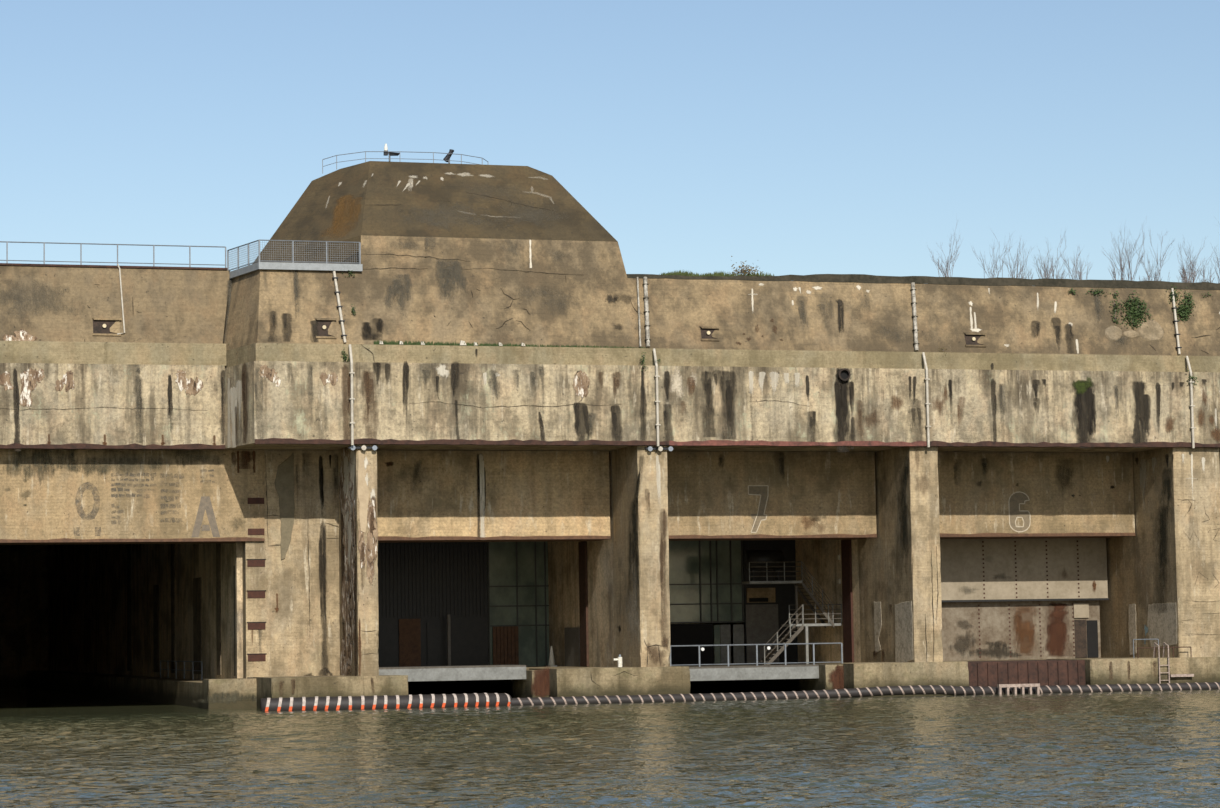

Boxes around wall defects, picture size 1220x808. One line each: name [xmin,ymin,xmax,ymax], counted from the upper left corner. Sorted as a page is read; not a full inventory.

spalling [0,368,74,407]
water stain [7,369,160,481]
spalling [175,370,203,396]
water stain [365,361,409,404]
water stain [574,403,591,441]
water stain [703,371,765,439]
water stain [806,375,816,442]
water stain [835,368,876,452]
water stain [1073,380,1095,448]
water stain [1133,382,1184,463]
water stain [319,366,376,676]
corrosion [1017,604,1067,655]